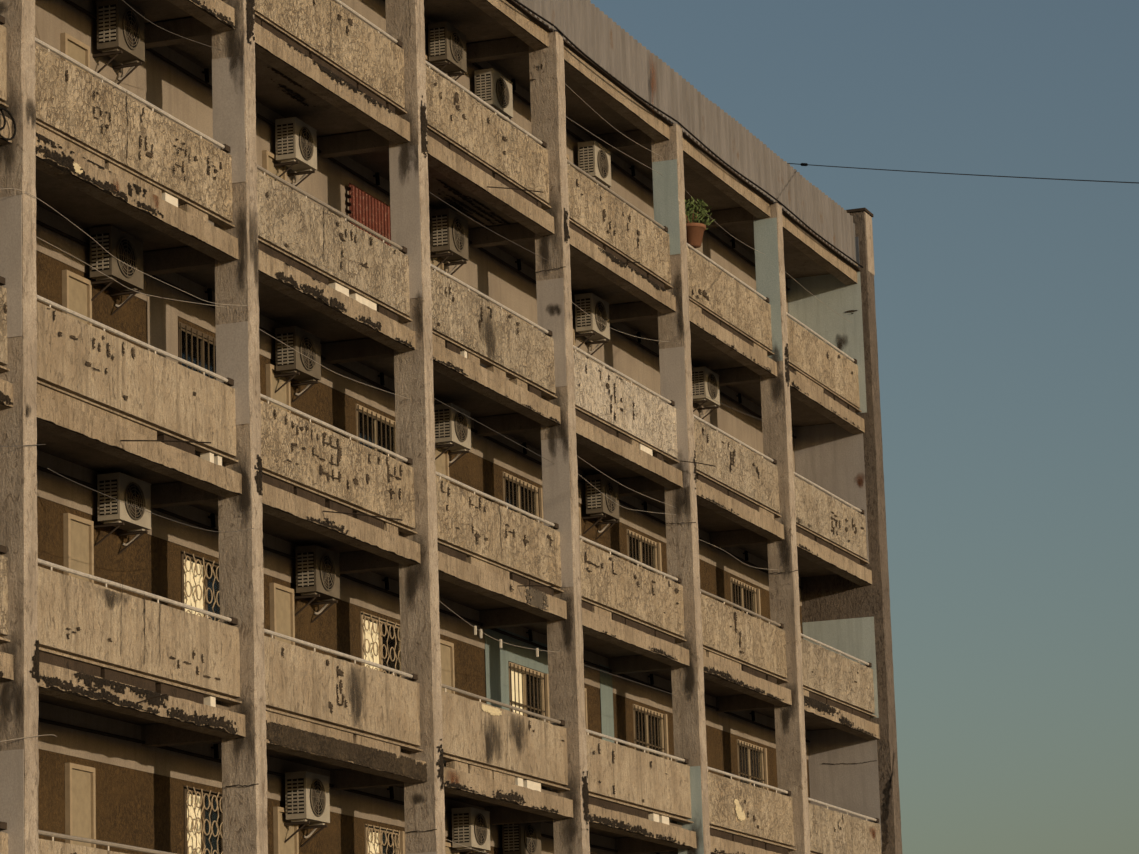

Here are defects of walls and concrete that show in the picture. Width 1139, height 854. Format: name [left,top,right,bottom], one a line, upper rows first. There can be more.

leakage [227,0,244,69]
spalling [35,132,164,218]
peeling [139,107,154,160]
peeling [173,138,222,181]
spalling [275,263,382,331]
peeling [579,365,635,421]
spalling [255,455,263,496]
peeling [274,409,402,500]
spalling [30,639,237,735]
peeling [327,660,348,714]